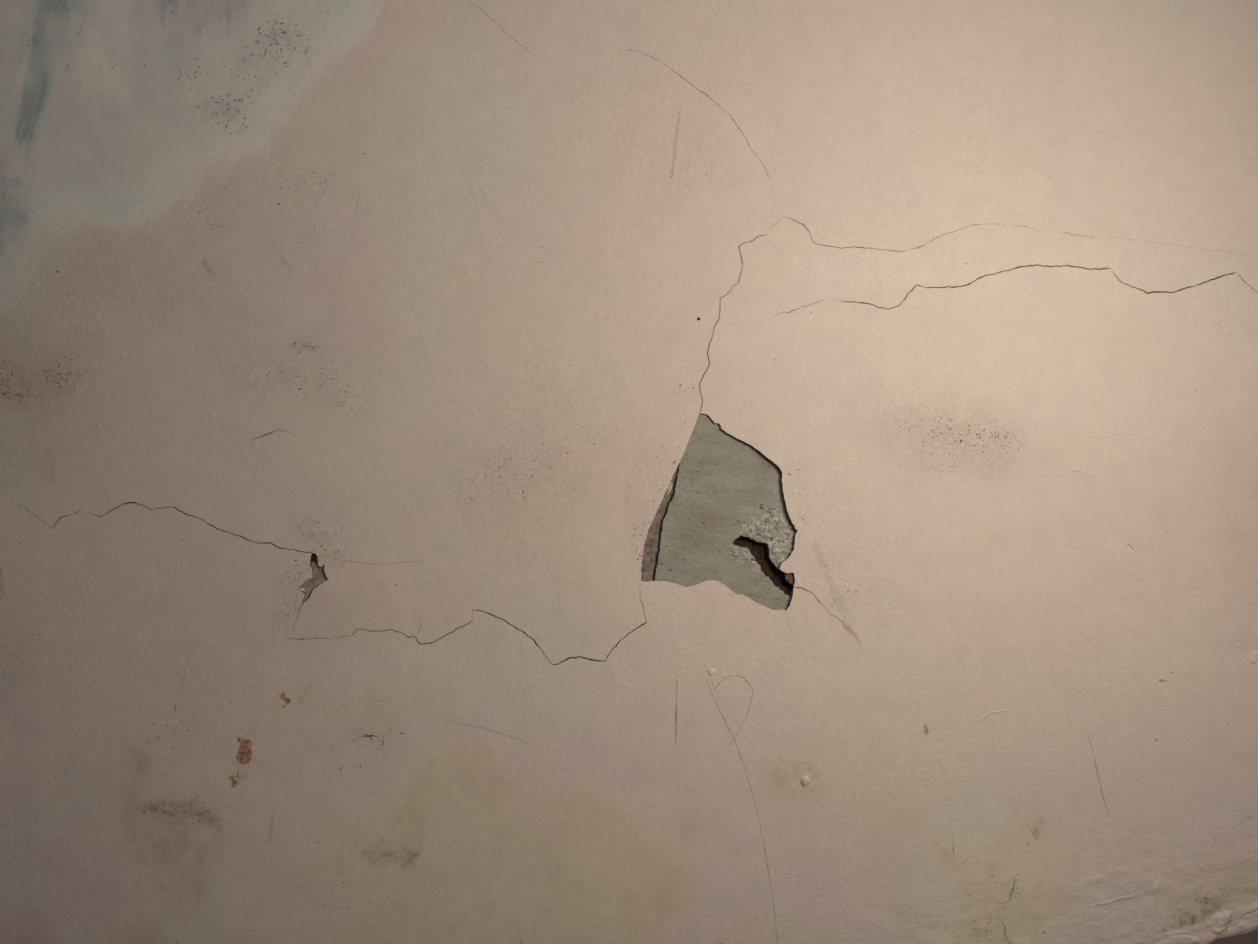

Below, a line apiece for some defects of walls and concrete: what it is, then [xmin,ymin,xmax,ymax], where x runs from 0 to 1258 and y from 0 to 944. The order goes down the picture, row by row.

crack [852,264,1236,309]
crack [699,315,720,410]
crack [53,502,313,554]
flaking render [280,519,353,605]
flaking render [633,413,804,610]
crack [365,600,647,665]